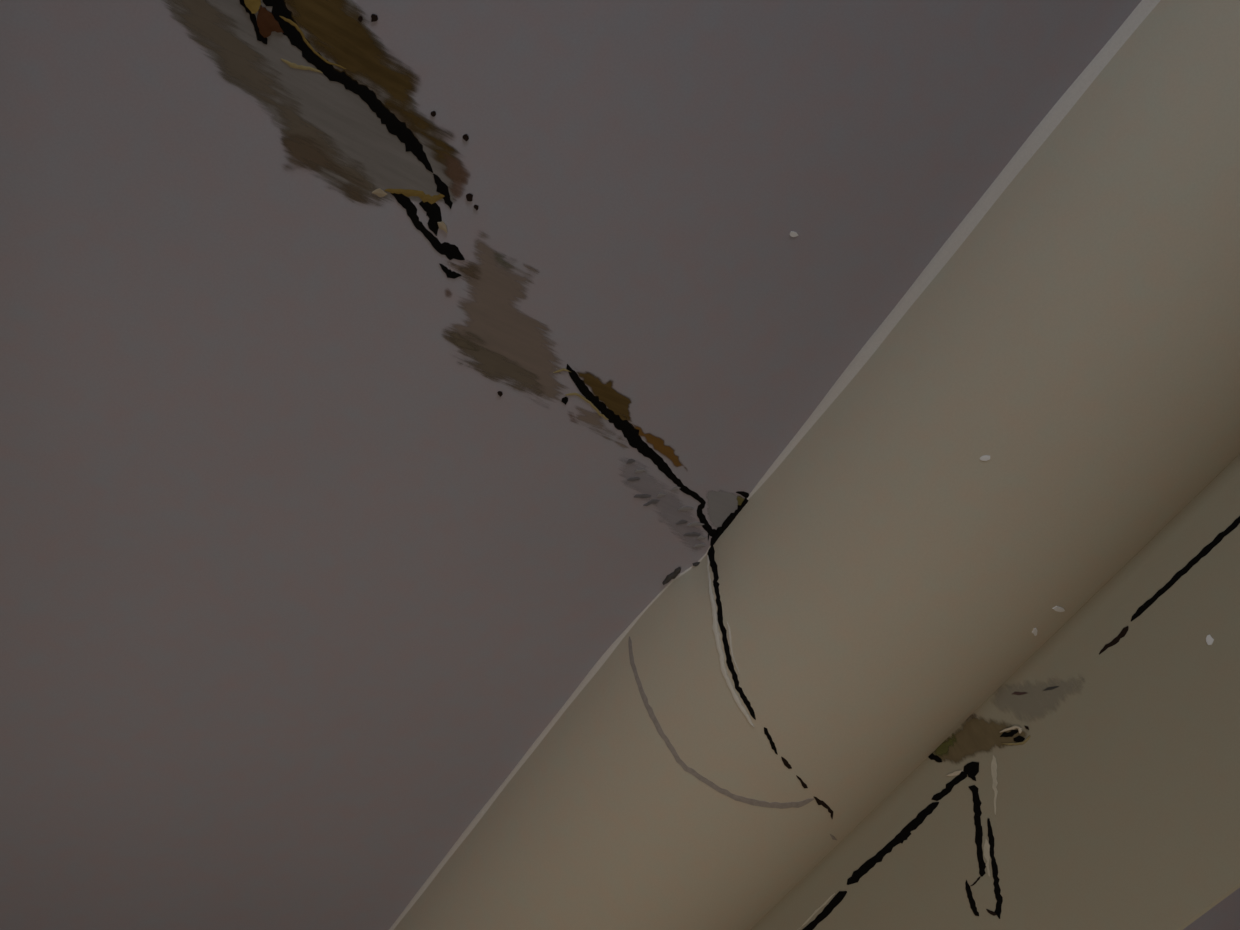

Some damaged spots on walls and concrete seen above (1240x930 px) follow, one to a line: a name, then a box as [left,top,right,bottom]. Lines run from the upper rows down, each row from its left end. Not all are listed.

flaking render [244,0,284,38]
damp [168,0,478,210]
damp [444,235,564,399]
crack [553,364,837,840]
flaking render [928,714,1030,776]
crack [797,755,1003,930]